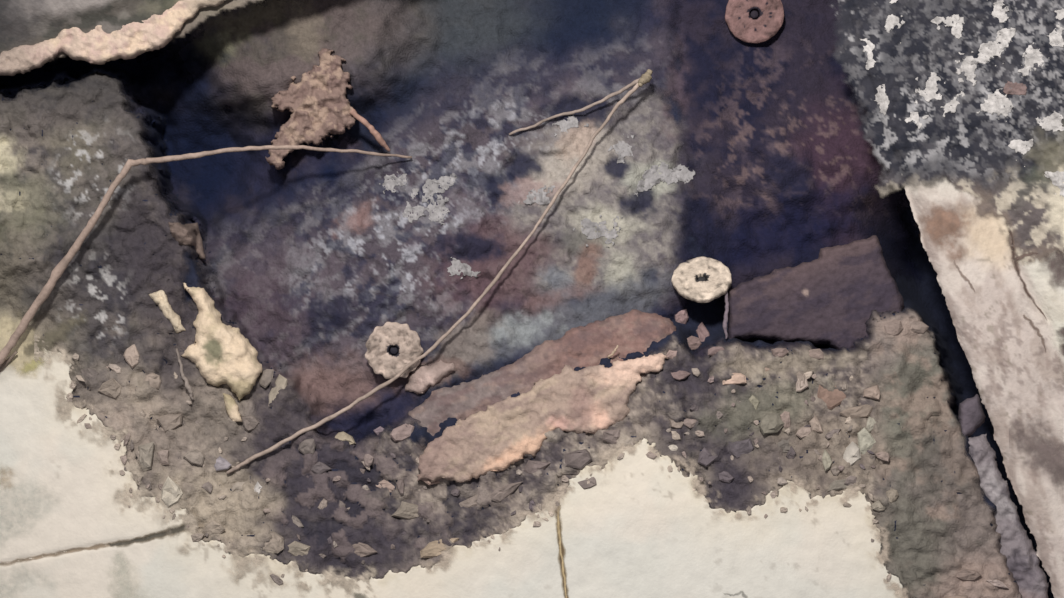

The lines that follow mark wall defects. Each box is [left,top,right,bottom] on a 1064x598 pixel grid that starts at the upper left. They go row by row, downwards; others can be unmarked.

flaking render [0,0,226,76]
flaking render [266,48,358,170]
rust [671,0,921,301]
damp [832,0,1064,285]
flaking render [168,222,206,260]
damp [0,0,697,439]
crack [954,261,975,291]
crack [1009,230,1046,351]
flaking render [34,283,1022,598]
crack [0,523,203,565]